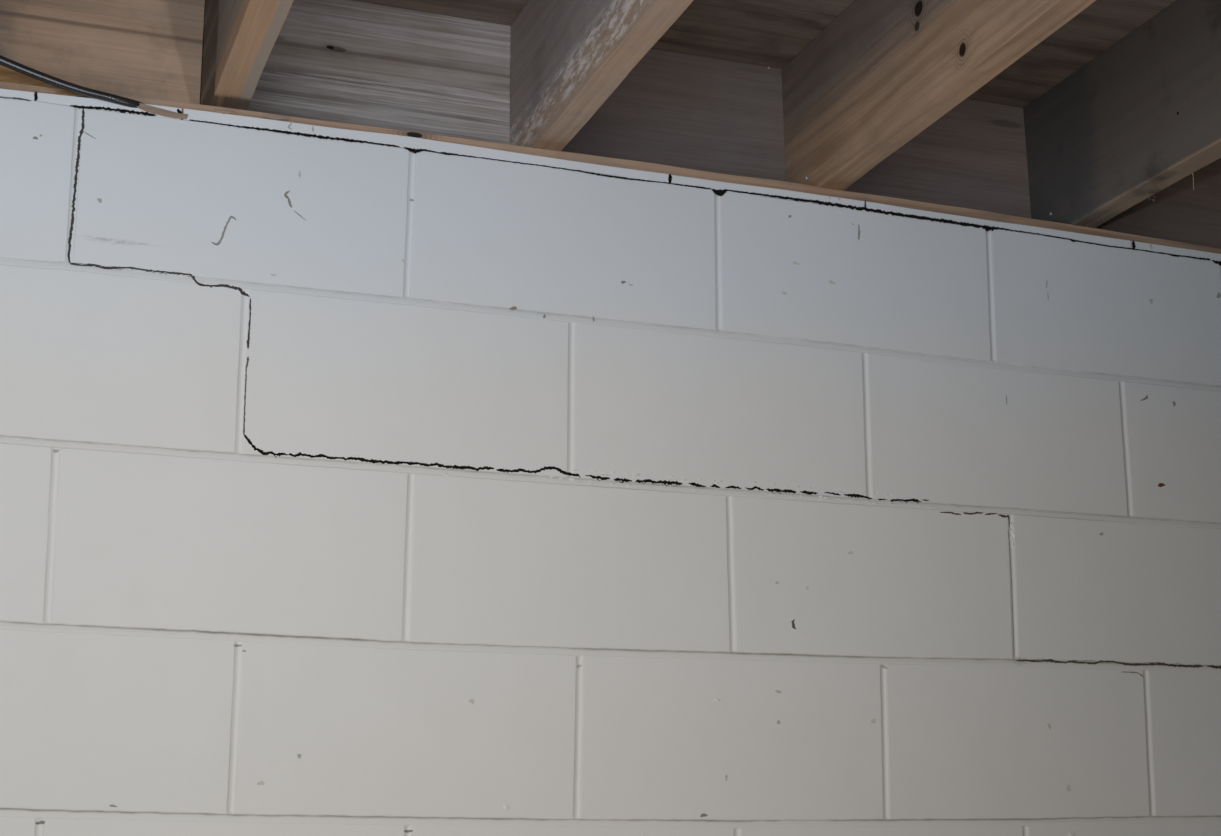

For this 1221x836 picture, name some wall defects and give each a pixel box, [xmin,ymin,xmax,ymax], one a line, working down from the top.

crack [67,105,1221,678]